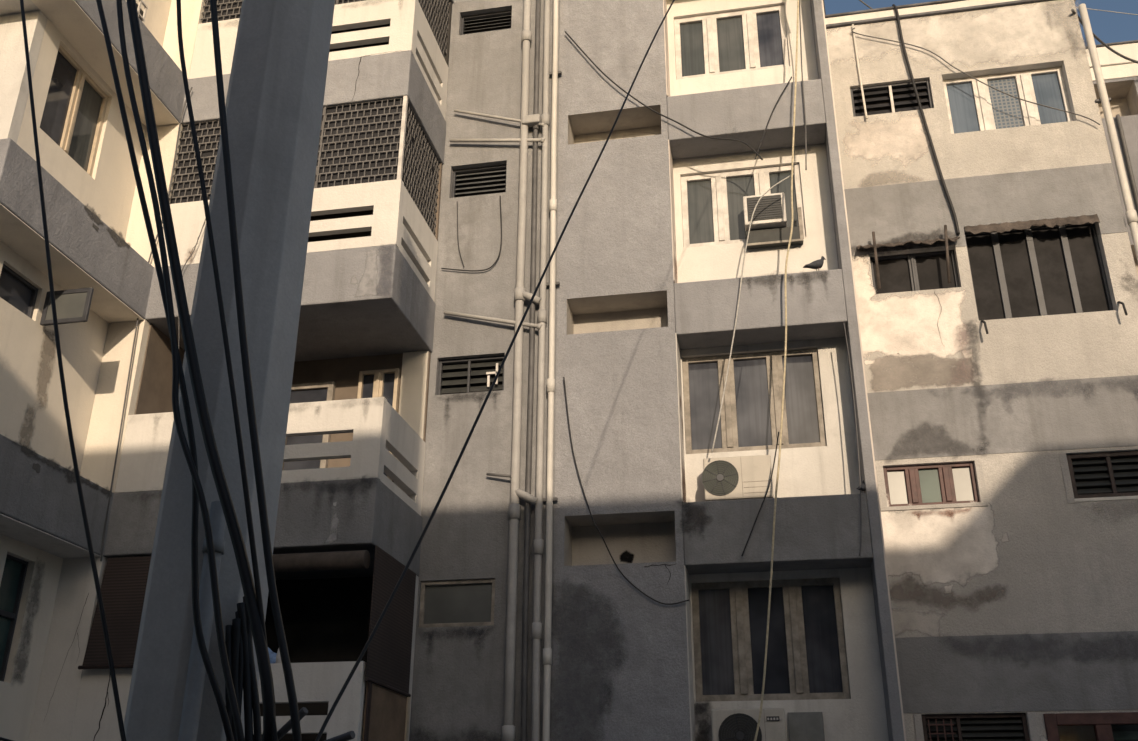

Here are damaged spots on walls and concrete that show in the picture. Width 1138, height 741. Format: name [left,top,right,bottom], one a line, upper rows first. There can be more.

peeling [852,258,973,391]
water stain [20,330,56,446]
water stain [890,423,986,459]
peeling [876,472,1009,594]
water stain [14,566,41,681]
water stain [890,577,1005,608]
crack [93,675,110,741]